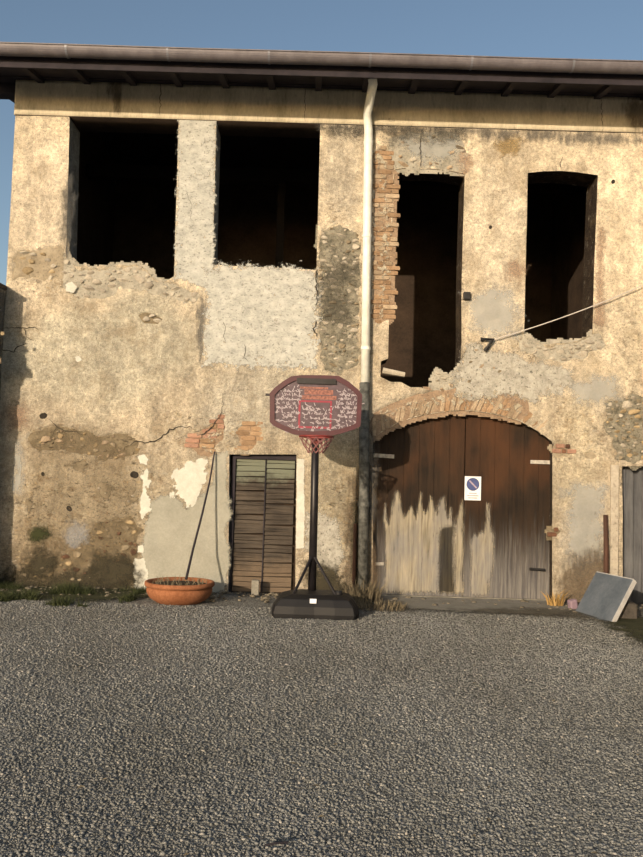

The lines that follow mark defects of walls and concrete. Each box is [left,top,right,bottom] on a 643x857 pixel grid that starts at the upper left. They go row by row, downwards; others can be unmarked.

damp [456,128,510,138]
damp [527,131,619,143]
damp [628,100,643,129]
flaking render [12,238,199,303]
flaking render [314,131,468,375]
crack [3,327,37,352]
flaking render [515,329,606,363]
crack [132,400,224,444]
peeling [169,415,225,508]
flaking render [369,342,547,442]
flaking render [604,393,643,471]
flaking render [22,413,152,588]